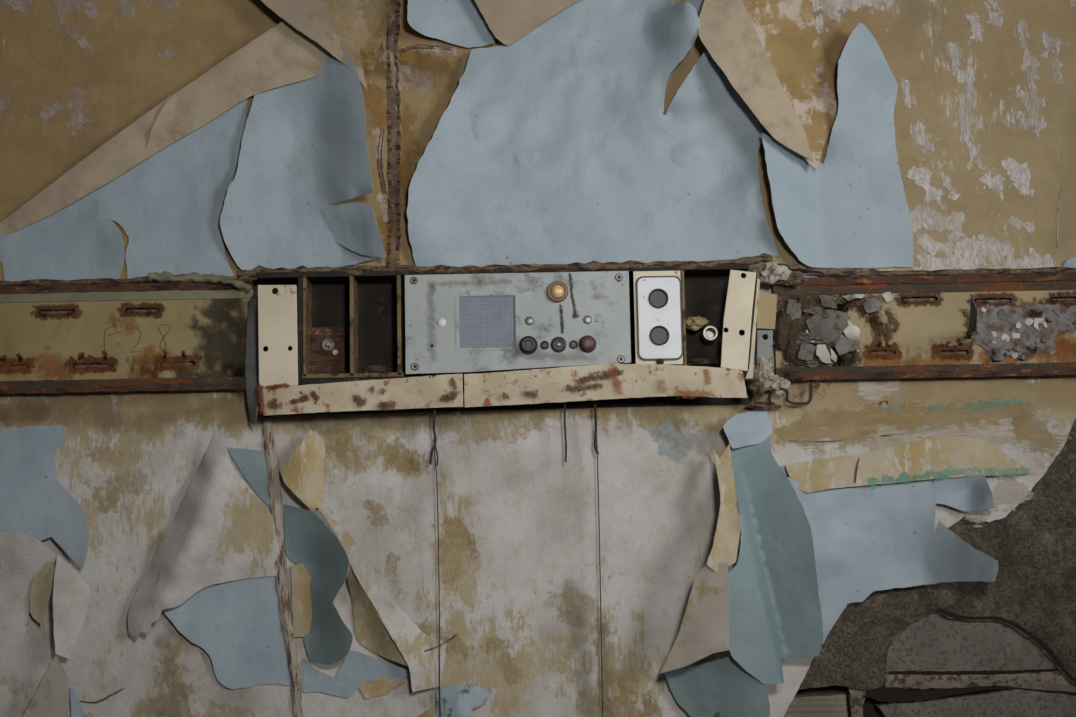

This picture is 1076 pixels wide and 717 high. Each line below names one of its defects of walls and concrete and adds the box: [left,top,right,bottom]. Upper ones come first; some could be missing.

peeling [0,0,1076,292]
rust [863,290,1076,366]
rust [0,351,118,380]
rust [130,347,202,379]
rust [256,383,320,415]
rust [354,387,396,411]
rust [440,378,458,401]
rust [567,367,623,394]
rust [658,370,711,397]
spalling [661,291,1076,717]
peeling [0,425,90,717]
peeling [128,428,492,717]